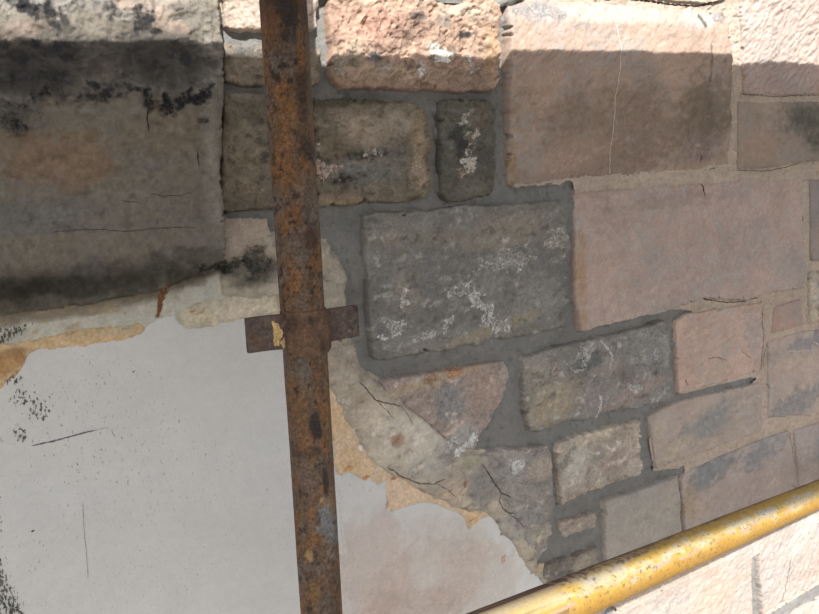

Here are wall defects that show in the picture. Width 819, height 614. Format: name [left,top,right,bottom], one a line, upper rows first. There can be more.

corrosion [156,285,169,317]
flaking render [177,231,280,329]
flaking render [321,238,348,309]
peeling [0,323,145,389]
crack [359,382,412,422]
flaking render [328,338,545,582]
crack [482,465,523,526]
damp [0,558,23,614]